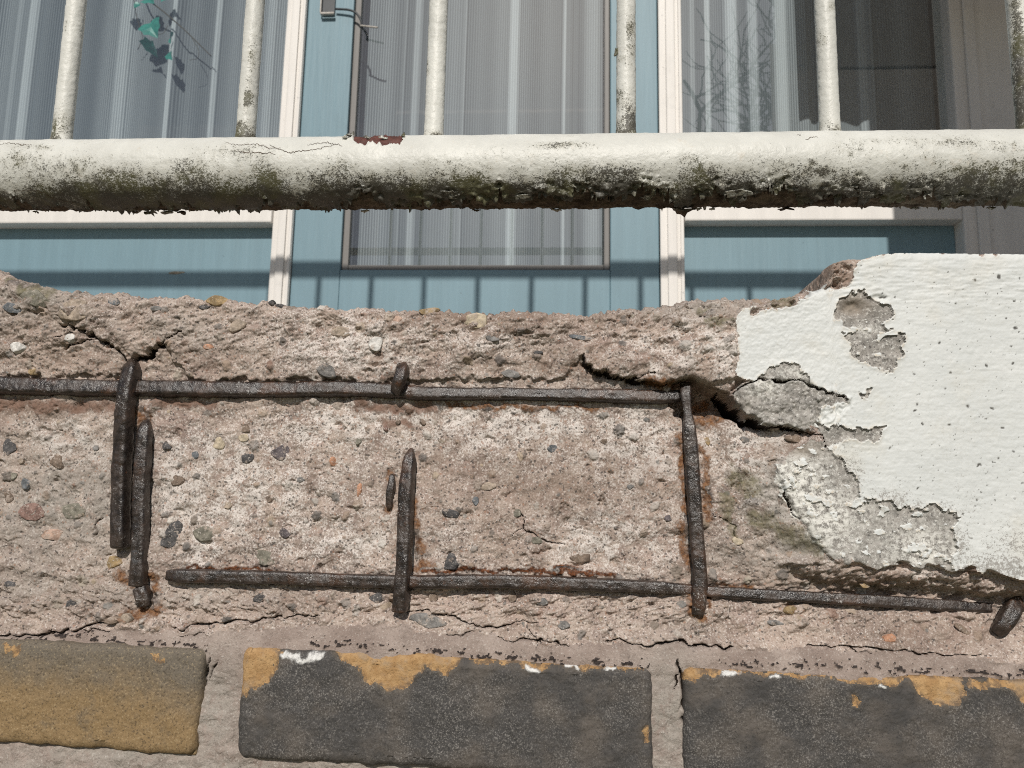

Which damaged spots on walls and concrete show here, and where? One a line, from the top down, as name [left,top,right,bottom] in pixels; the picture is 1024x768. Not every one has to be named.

crack [55,323,182,361]
crack [582,355,666,389]
rust [645,376,675,390]
rust [355,397,599,428]
spalling [0,254,1024,665]
rust [675,433,691,566]
rust [413,498,616,577]
rust [186,563,278,571]
crack [0,622,110,638]
crack [175,614,318,637]
crack [409,610,568,646]
crack [811,644,981,656]